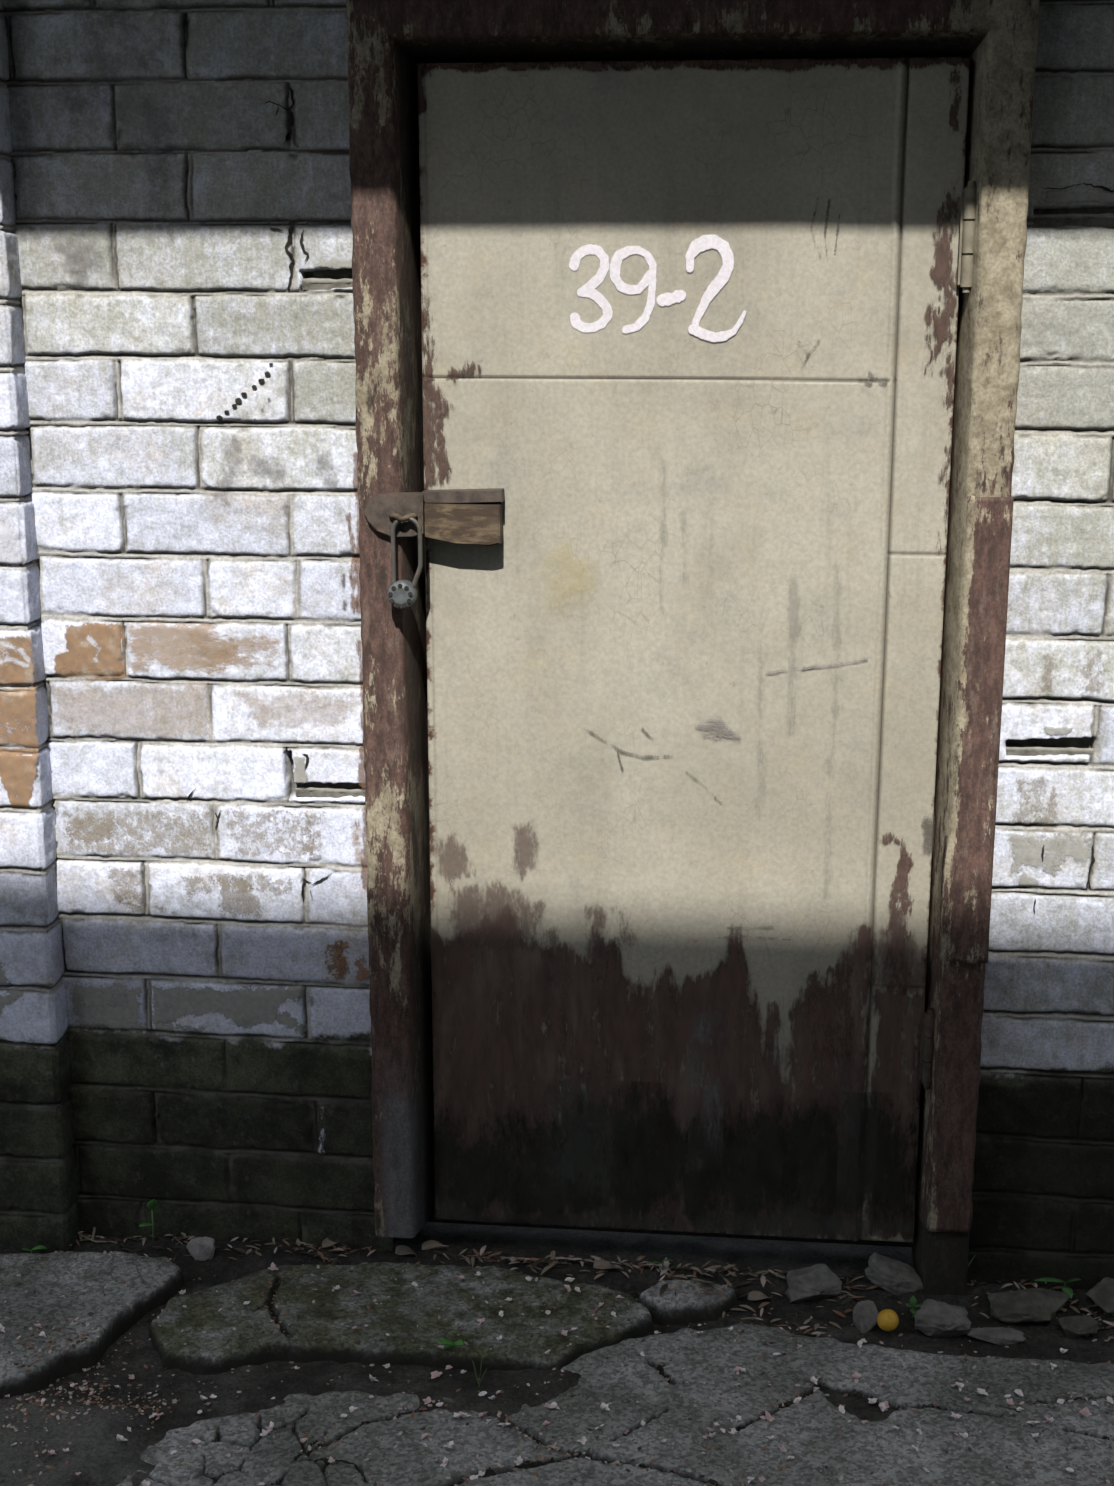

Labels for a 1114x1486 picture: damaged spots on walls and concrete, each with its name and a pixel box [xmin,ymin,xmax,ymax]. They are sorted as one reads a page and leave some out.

spalling [294,756,365,797]
peeling [0,965,24,1015]
peeling [71,983,307,1036]
rust [431,813,935,1242]
crack [259,1278,290,1338]
crack [637,1361,671,1429]
crack [736,1395,810,1432]
crack [857,1395,1114,1440]
crack [271,1412,411,1486]
crack [450,1429,719,1486]